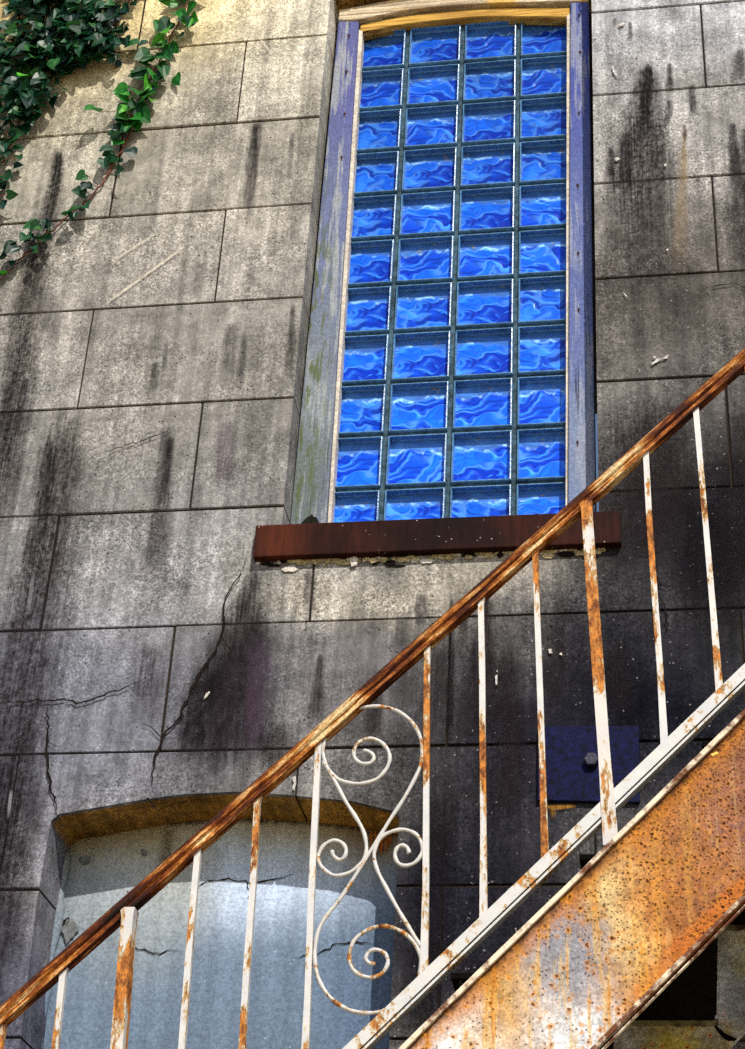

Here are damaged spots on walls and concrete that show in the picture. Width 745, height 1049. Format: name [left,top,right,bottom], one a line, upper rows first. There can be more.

leakage [608,63,687,250]
leakage [730,123,745,271]
leakage [0,154,63,505]
leakage [0,427,77,983]
crack [1,673,155,827]
crack [143,563,246,809]
rust [370,831,391,853]
rust [714,1026,737,1041]